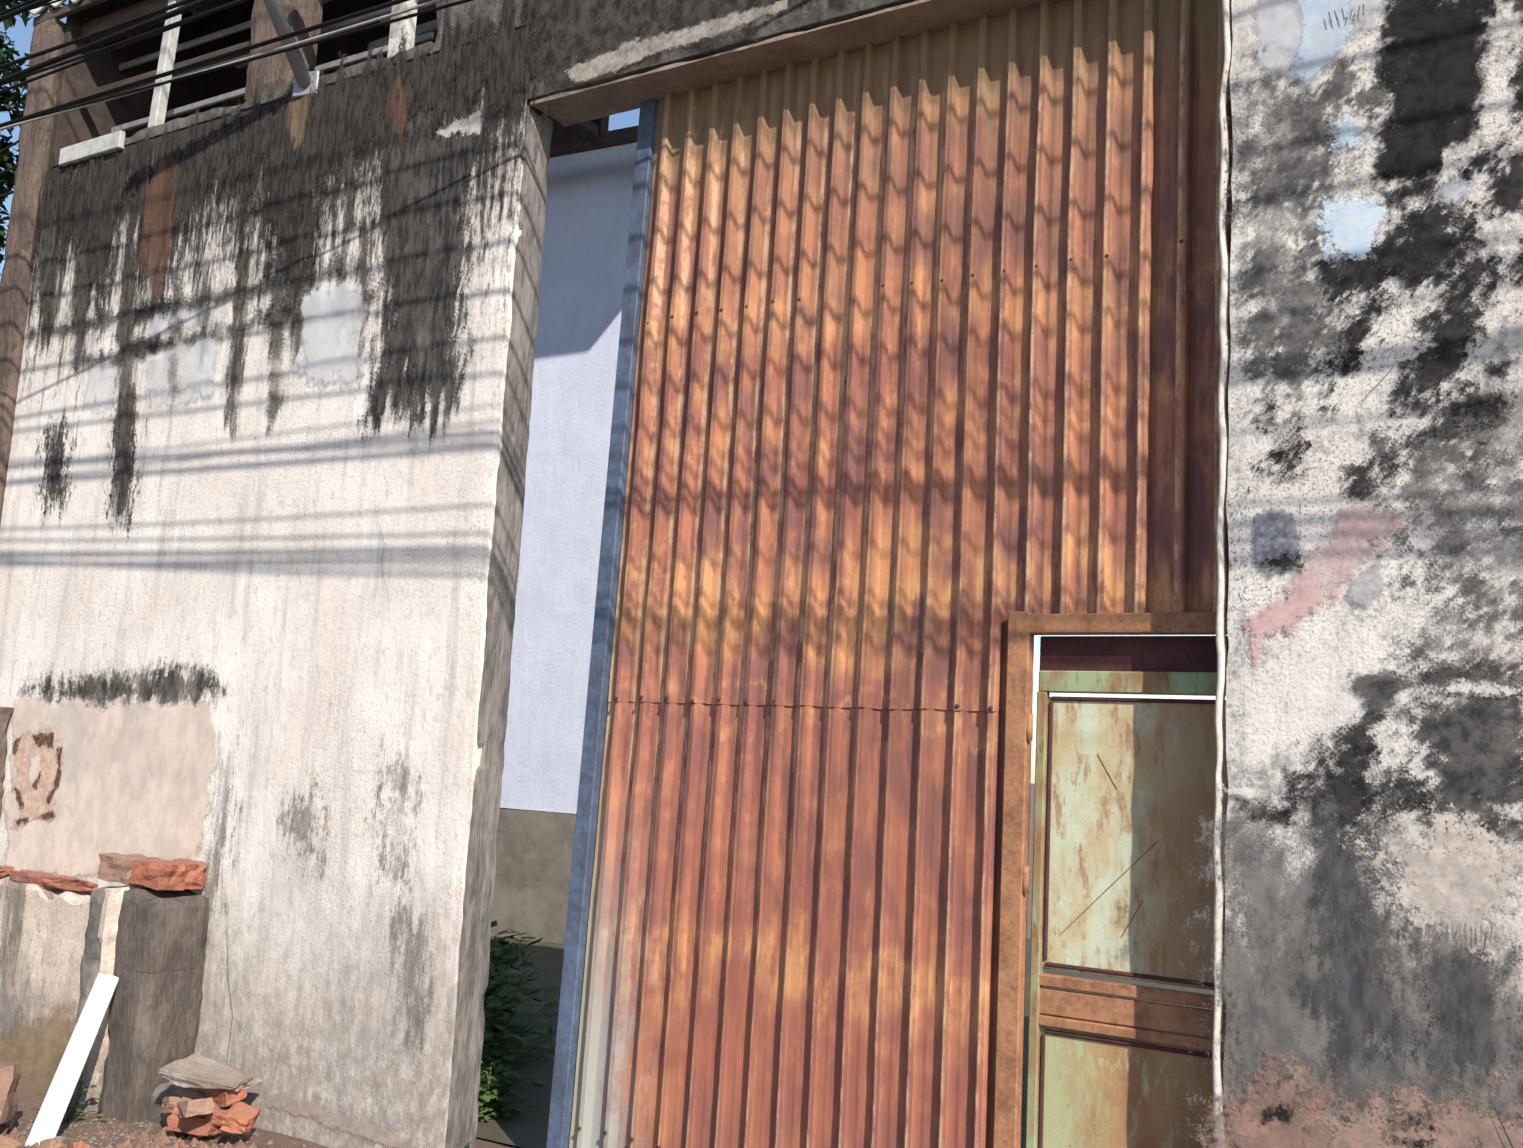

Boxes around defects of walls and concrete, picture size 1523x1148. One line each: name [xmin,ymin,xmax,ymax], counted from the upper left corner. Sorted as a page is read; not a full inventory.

spalling [565,0,788,83]
water stain [26,0,852,543]
peeling [1241,502,1407,670]
water stain [1188,0,1523,1127]
water stain [17,657,227,709]
spalling [10,727,64,831]